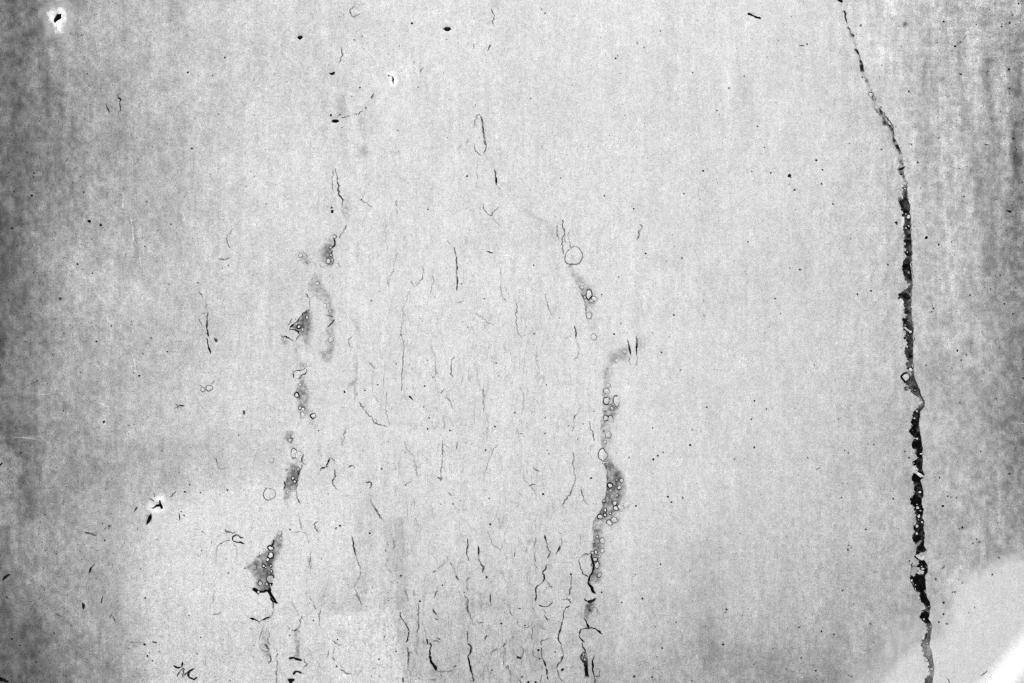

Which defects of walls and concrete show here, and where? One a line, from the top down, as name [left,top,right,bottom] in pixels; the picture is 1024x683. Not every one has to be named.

leakage [244,529,286,623]
leakage [283,233,362,510]
leakage [572,275,600,341]
leakage [577,332,649,602]
crack [836,0,935,683]